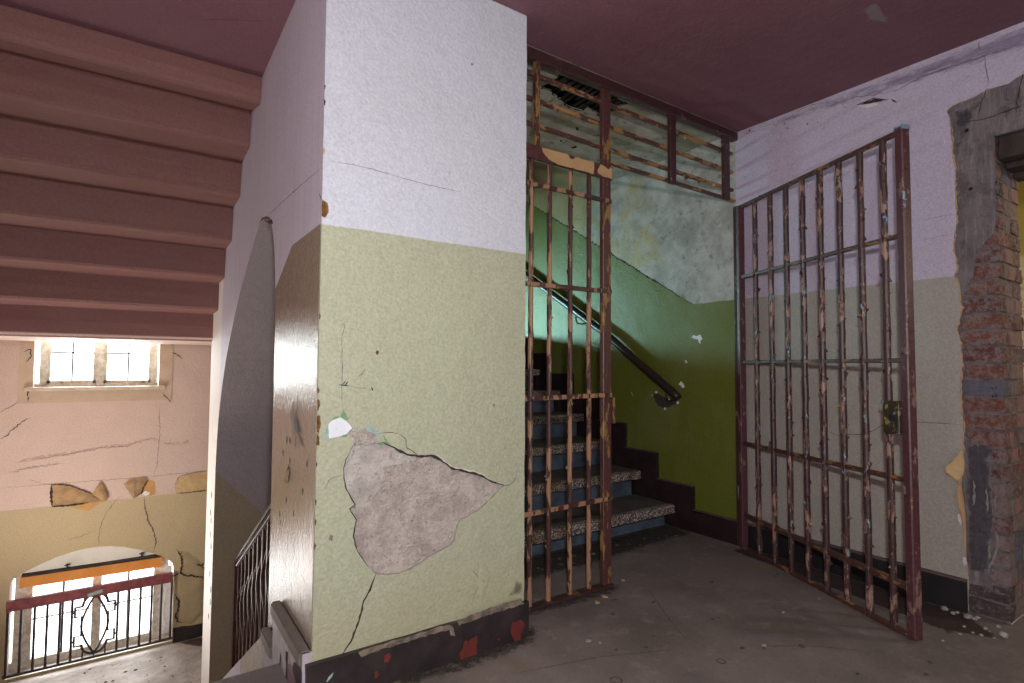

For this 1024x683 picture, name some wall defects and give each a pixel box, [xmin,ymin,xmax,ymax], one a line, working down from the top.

spalling [541,75,627,116]
crack [264,161,459,219]
spalling [943,73,1024,624]
crack [0,391,29,439]
peeling [49,482,107,511]
crack [7,395,206,623]
peeling [124,476,155,498]
peeling [175,471,212,498]
spalling [325,410,516,575]
crack [343,575,376,653]
peeling [358,598,525,679]